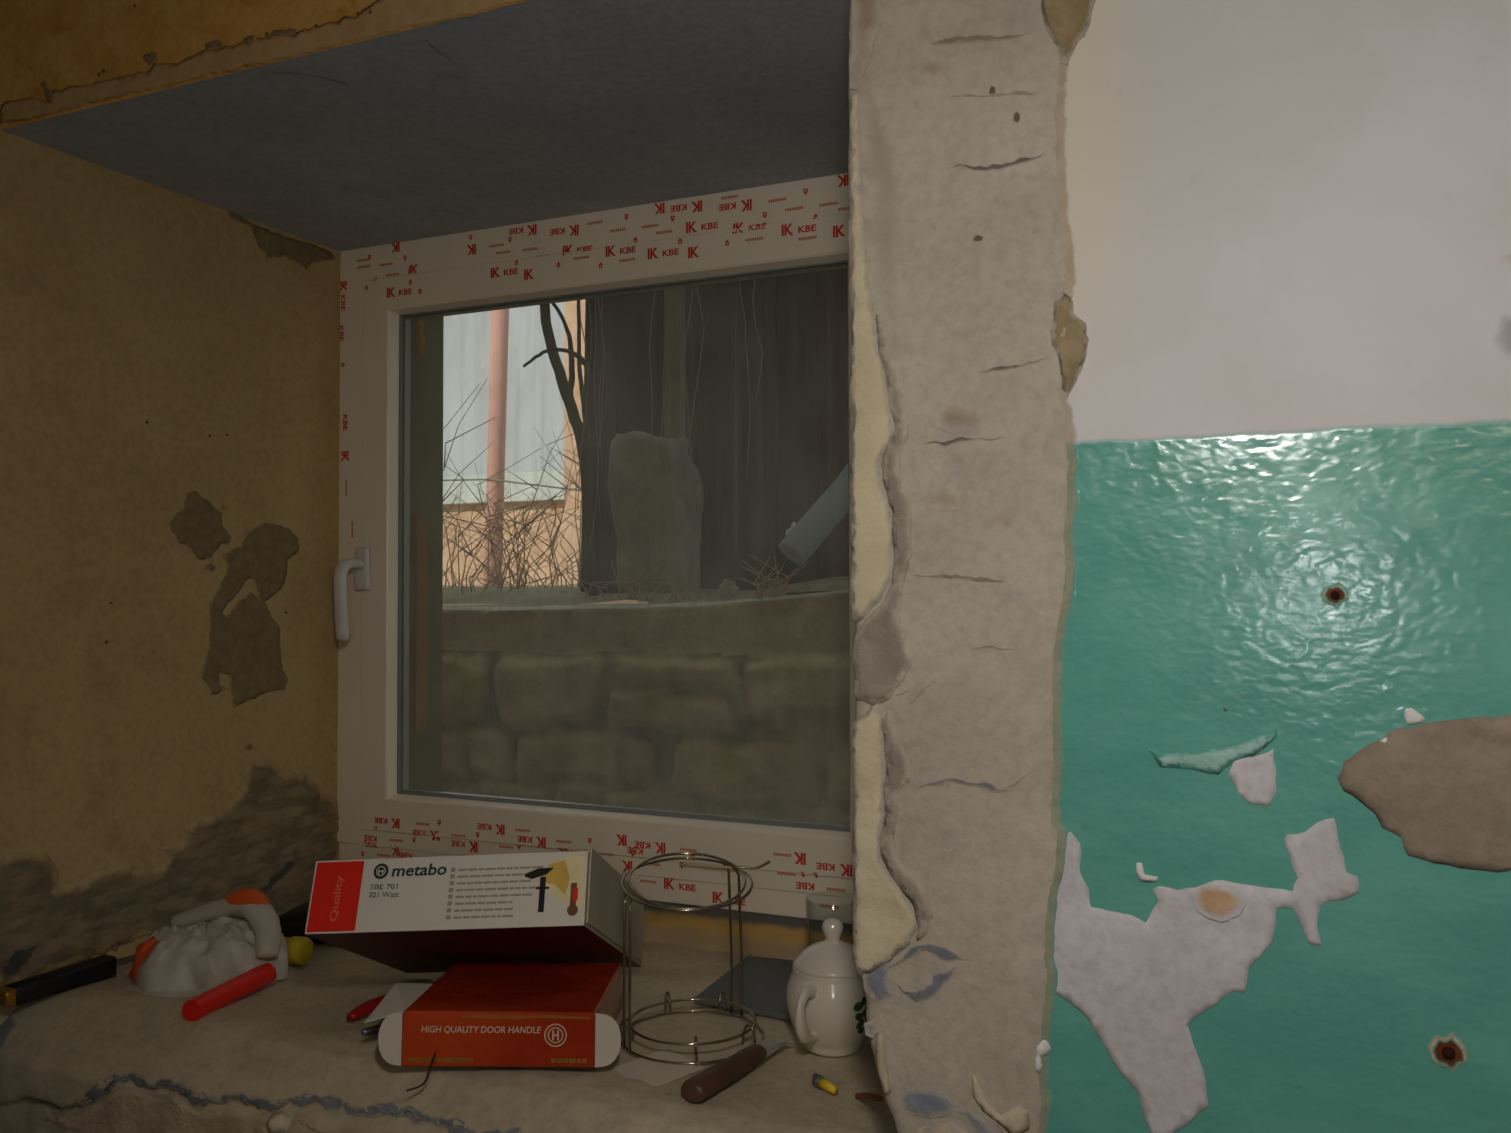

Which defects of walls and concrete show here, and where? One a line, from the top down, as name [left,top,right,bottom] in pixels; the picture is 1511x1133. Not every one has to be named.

crack [926,32,1030,45]
flaking render [1040,0,1096,67]
flaking render [1050,294,1089,400]
flaking render [167,491,299,708]
crack [917,58,1080,1133]
rust [1320,581,1349,610]
peeling [1144,728,1277,806]
flaking render [1337,708,1511,872]
flaking render [0,742,339,988]
peeling [1053,818,1360,1133]
crack [31,1072,529,1133]
rust [1426,1031,1470,1075]